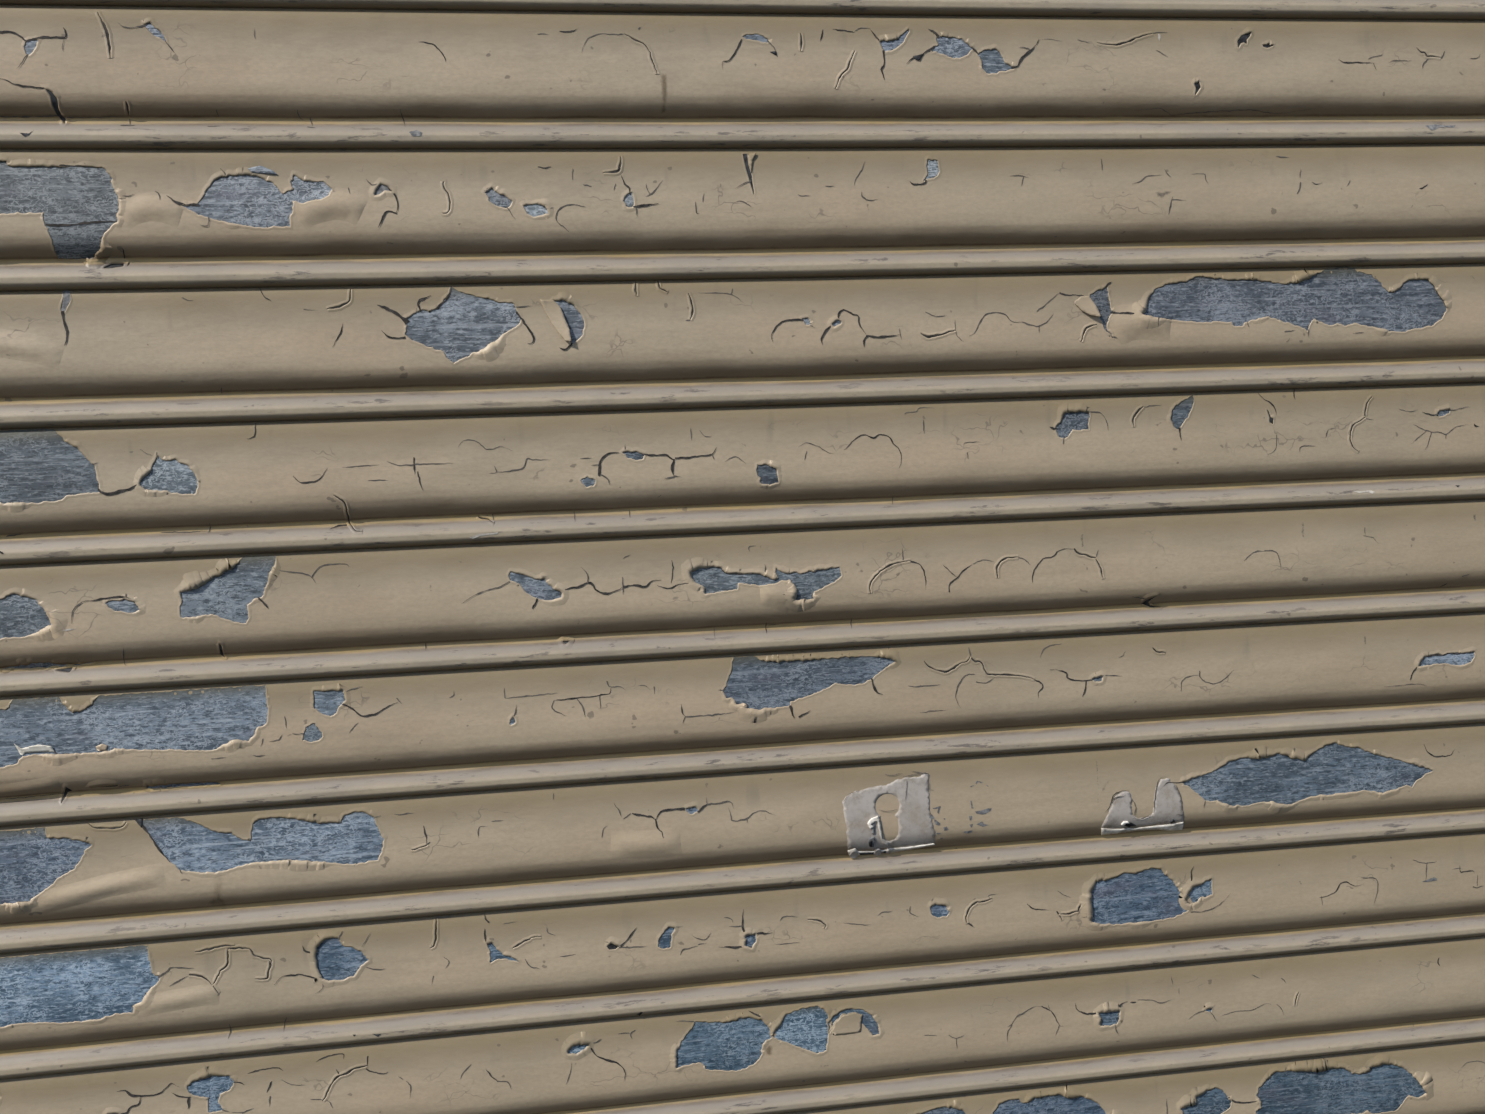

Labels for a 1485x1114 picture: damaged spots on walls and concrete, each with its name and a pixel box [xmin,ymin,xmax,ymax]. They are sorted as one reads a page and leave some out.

peeling [0,155,134,268]
peeling [1074,266,1452,341]
peeling [0,428,201,513]
crack [850,547,1145,628]
peeling [720,647,901,723]
crack [912,643,1062,713]
peeling [0,684,272,771]
peeling [1163,739,1435,814]
peeling [135,807,388,878]
peeling [0,944,190,1032]
peeling [669,1004,885,1073]
peeling [1166,1052,1434,1114]